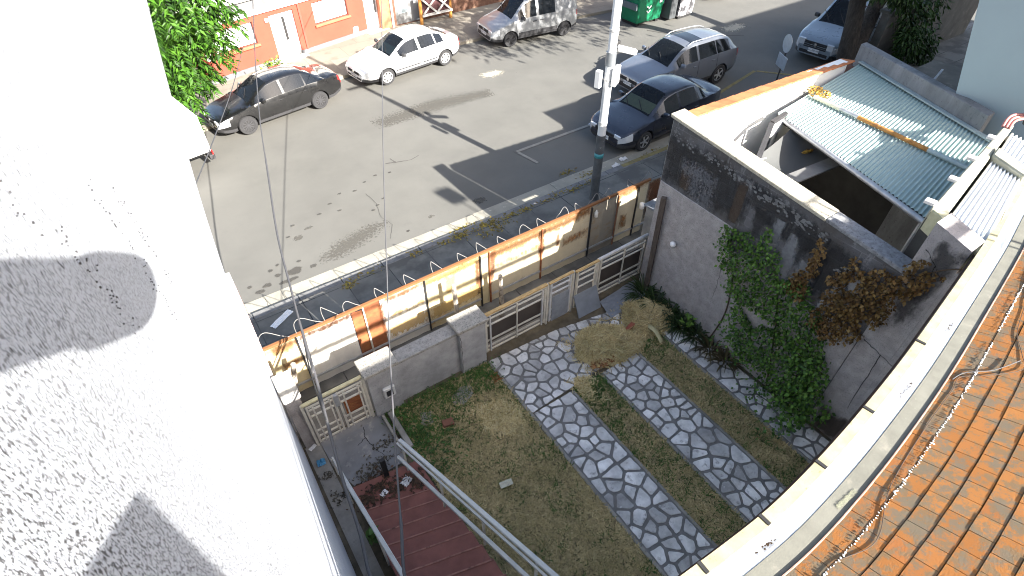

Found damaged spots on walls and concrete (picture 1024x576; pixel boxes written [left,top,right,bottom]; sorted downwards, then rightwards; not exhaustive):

rust [379,209,590,336]
rust [620,179,661,218]
leakage [664,136,861,323]